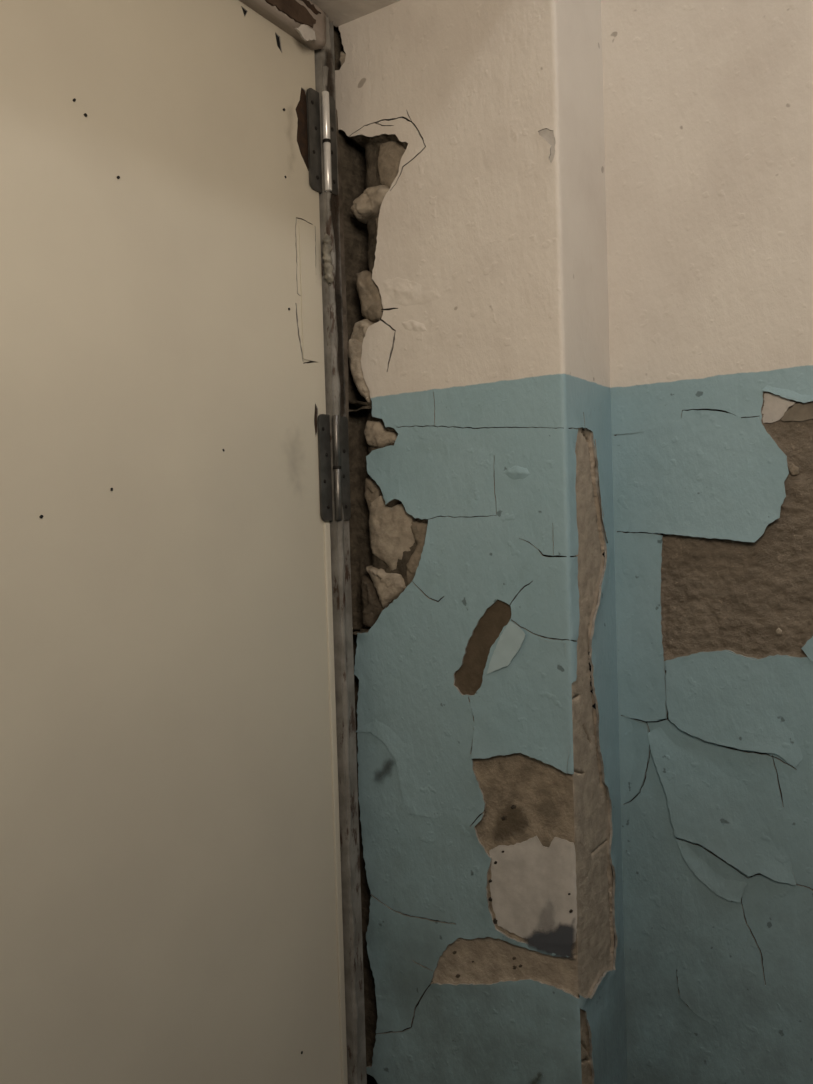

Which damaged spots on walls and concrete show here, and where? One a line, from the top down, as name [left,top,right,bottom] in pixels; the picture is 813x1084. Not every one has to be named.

spalling [338,130,428,635]
crack [375,116,426,146]
spalling [431,428,615,1084]
spalling [617,385,813,902]